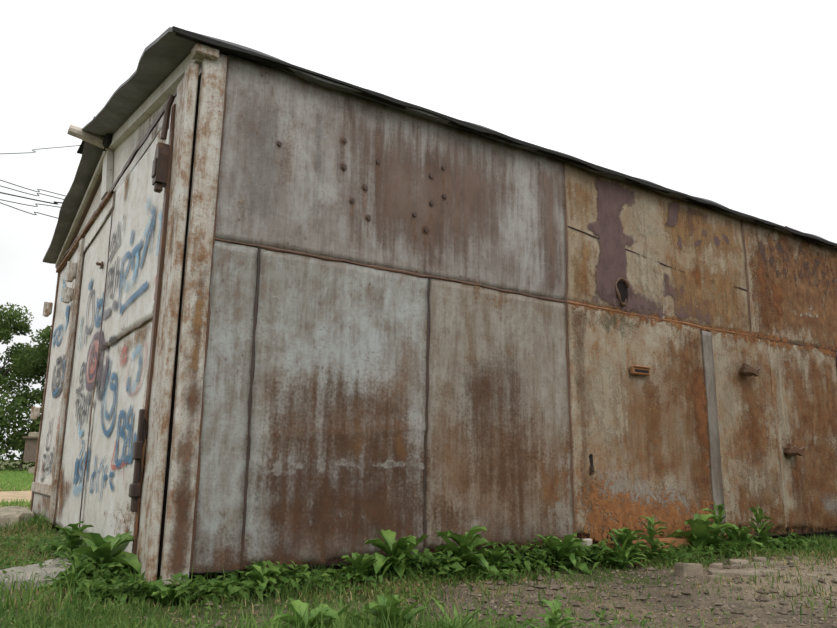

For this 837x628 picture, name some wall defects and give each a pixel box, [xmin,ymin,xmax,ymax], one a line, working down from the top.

rust [340,117,513,270]
rust [538,171,560,289]
rust [186,289,205,416]
rust [442,200,837,550]
rust [95,496,147,538]
rust [169,428,247,575]
rust [258,378,424,567]